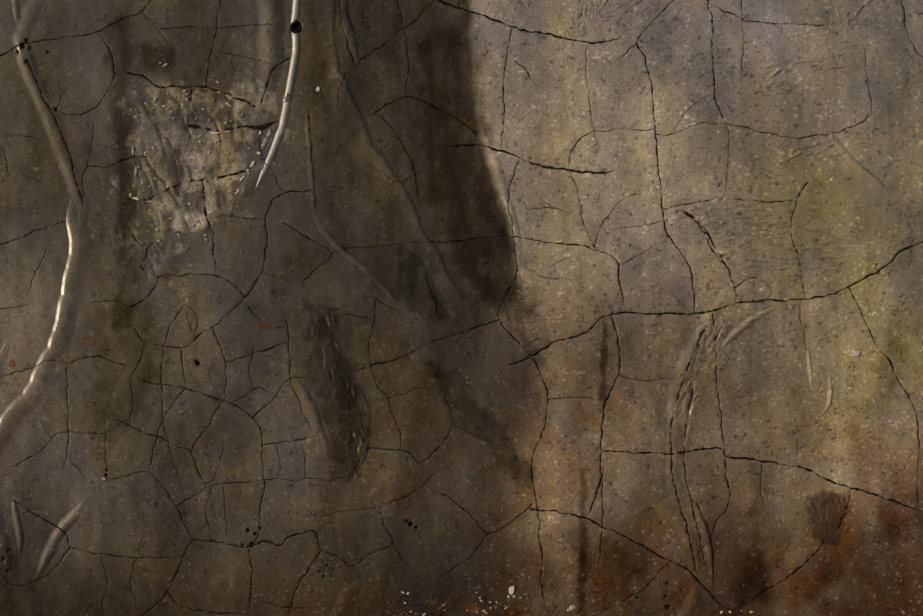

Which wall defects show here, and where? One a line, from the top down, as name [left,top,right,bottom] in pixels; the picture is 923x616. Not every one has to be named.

crack [0,0,433,616]
crack [284,0,923,615]